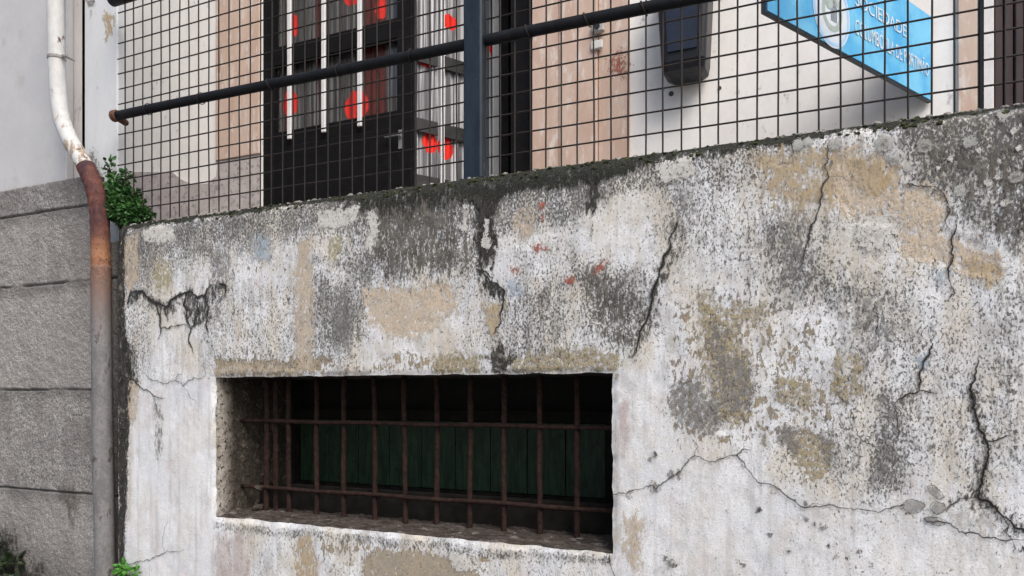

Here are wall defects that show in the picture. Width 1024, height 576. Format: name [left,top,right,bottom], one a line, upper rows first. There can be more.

crack [117,280,227,400]
peeling [359,276,463,342]
leakage [363,188,503,291]
crack [476,268,507,337]
leakage [585,170,603,237]
crack [627,221,686,362]
leakage [664,178,709,258]
crack [801,146,852,265]
spalling [824,143,1024,291]
crack [947,225,957,297]
leakage [897,117,1024,256]
crack [612,343,1024,552]